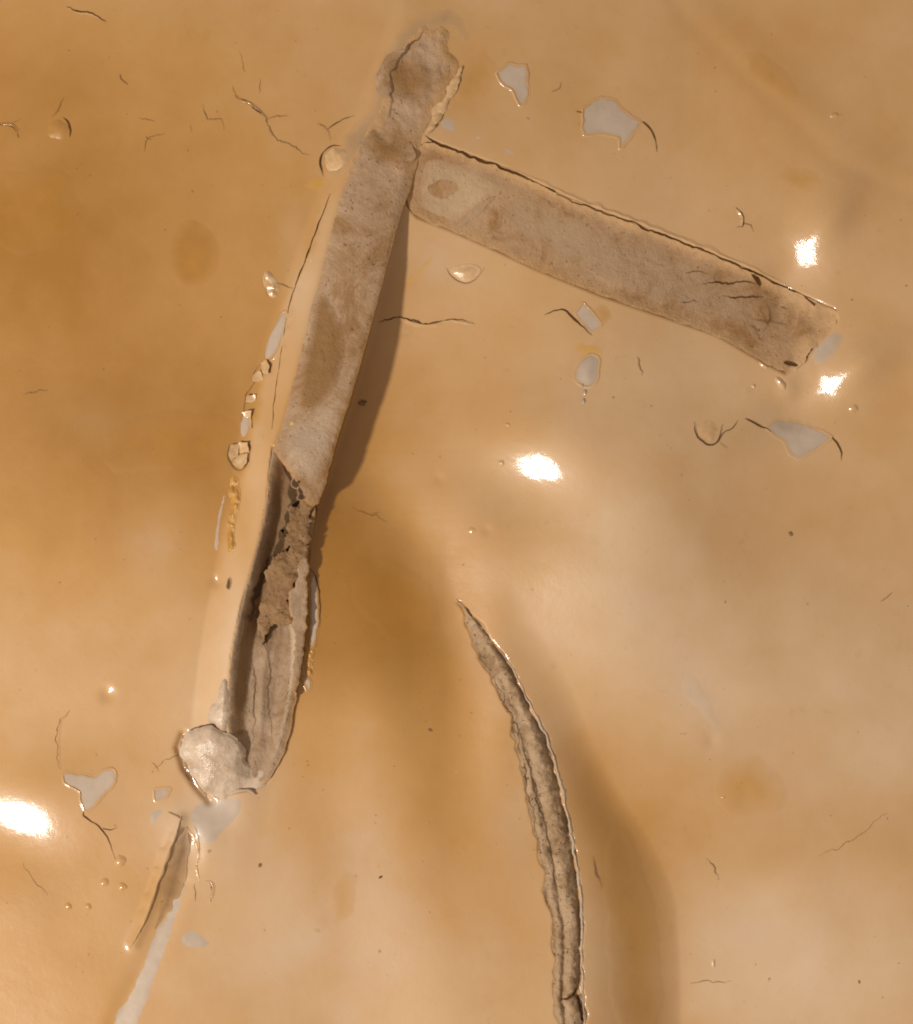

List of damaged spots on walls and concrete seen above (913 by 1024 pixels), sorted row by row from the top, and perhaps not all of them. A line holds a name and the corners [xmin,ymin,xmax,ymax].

crack [234,57,307,155]
crack [272,188,336,423]
crack [379,316,474,328]
spalling [226,25,843,783]
peeling [215,496,224,550]
peeling [61,767,118,860]
peeling [114,786,242,1024]